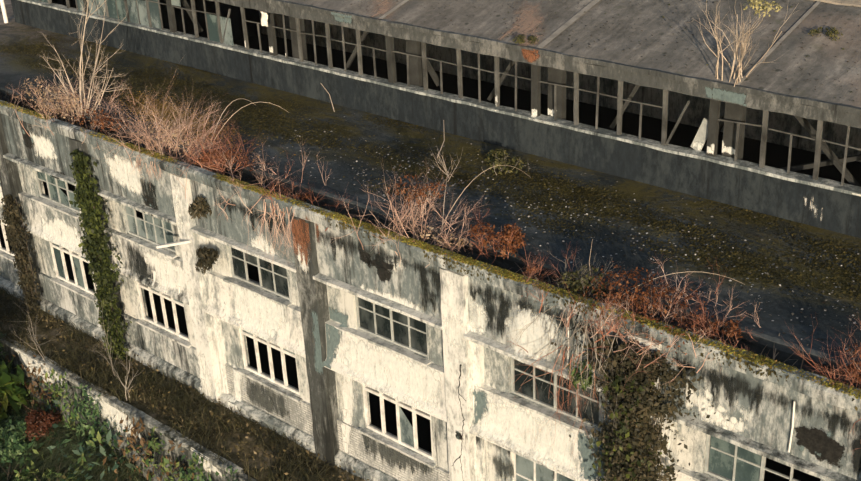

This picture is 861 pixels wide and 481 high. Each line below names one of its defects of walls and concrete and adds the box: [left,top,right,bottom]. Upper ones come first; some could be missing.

rust [500,4,543,63]
rust [291,217,319,266]
damp [317,232,440,318]
damp [470,284,600,341]
damp [677,355,793,412]
crack [452,364,466,481]
damp [823,412,861,474]